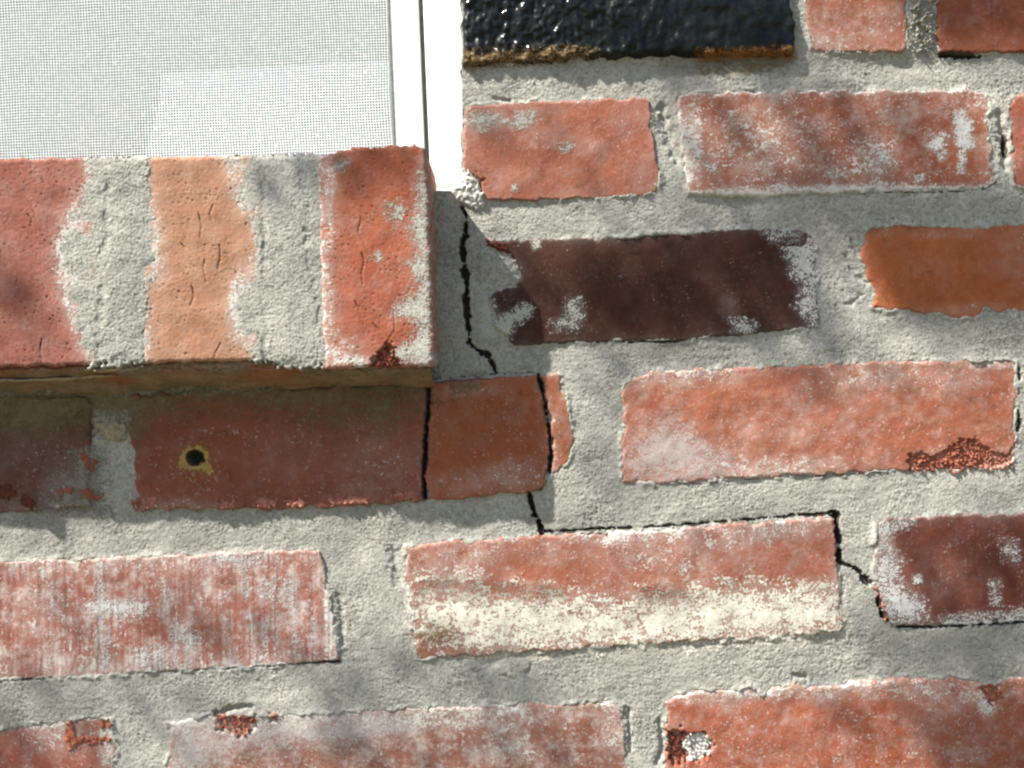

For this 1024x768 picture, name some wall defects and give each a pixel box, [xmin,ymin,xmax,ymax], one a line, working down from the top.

peeling [370,169,434,368]
crack [421,379,435,500]
crack [459,203,1024,629]
spalling [907,438,1012,475]
efflorescence [78,560,205,676]
efflorescence [208,547,321,670]
efflorescence [400,568,854,662]
spalling [213,710,278,737]
spalling [664,729,713,763]